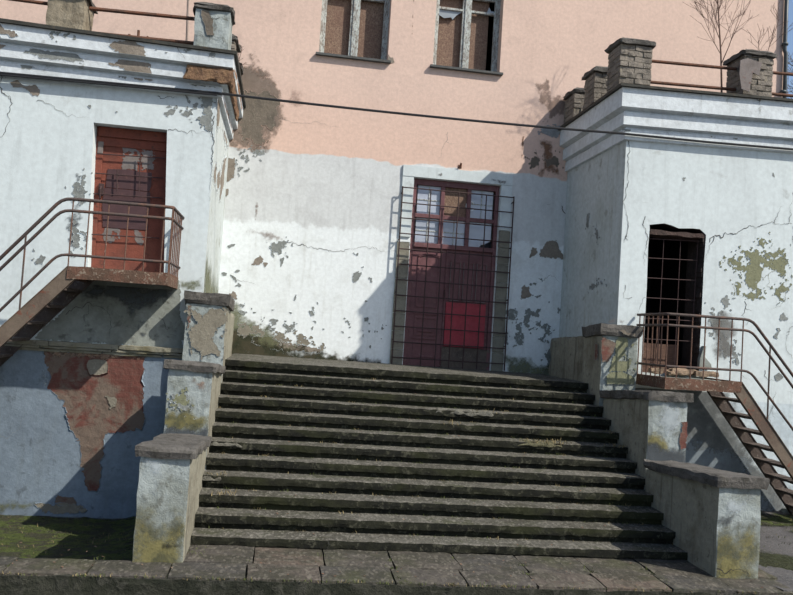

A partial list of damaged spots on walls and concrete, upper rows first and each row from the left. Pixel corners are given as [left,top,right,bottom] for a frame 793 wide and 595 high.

peeling [20,31,84,70]
peeling [5,77,40,96]
leakage [230,54,283,152]
peeling [164,84,280,202]
peeling [251,237,293,267]
peeling [529,240,563,260]
crack [706,203,793,256]
spalling [35,269,326,492]
leakage [231,329,381,363]
peeling [504,278,560,365]
peeling [594,329,638,385]
peeling [705,232,793,365]